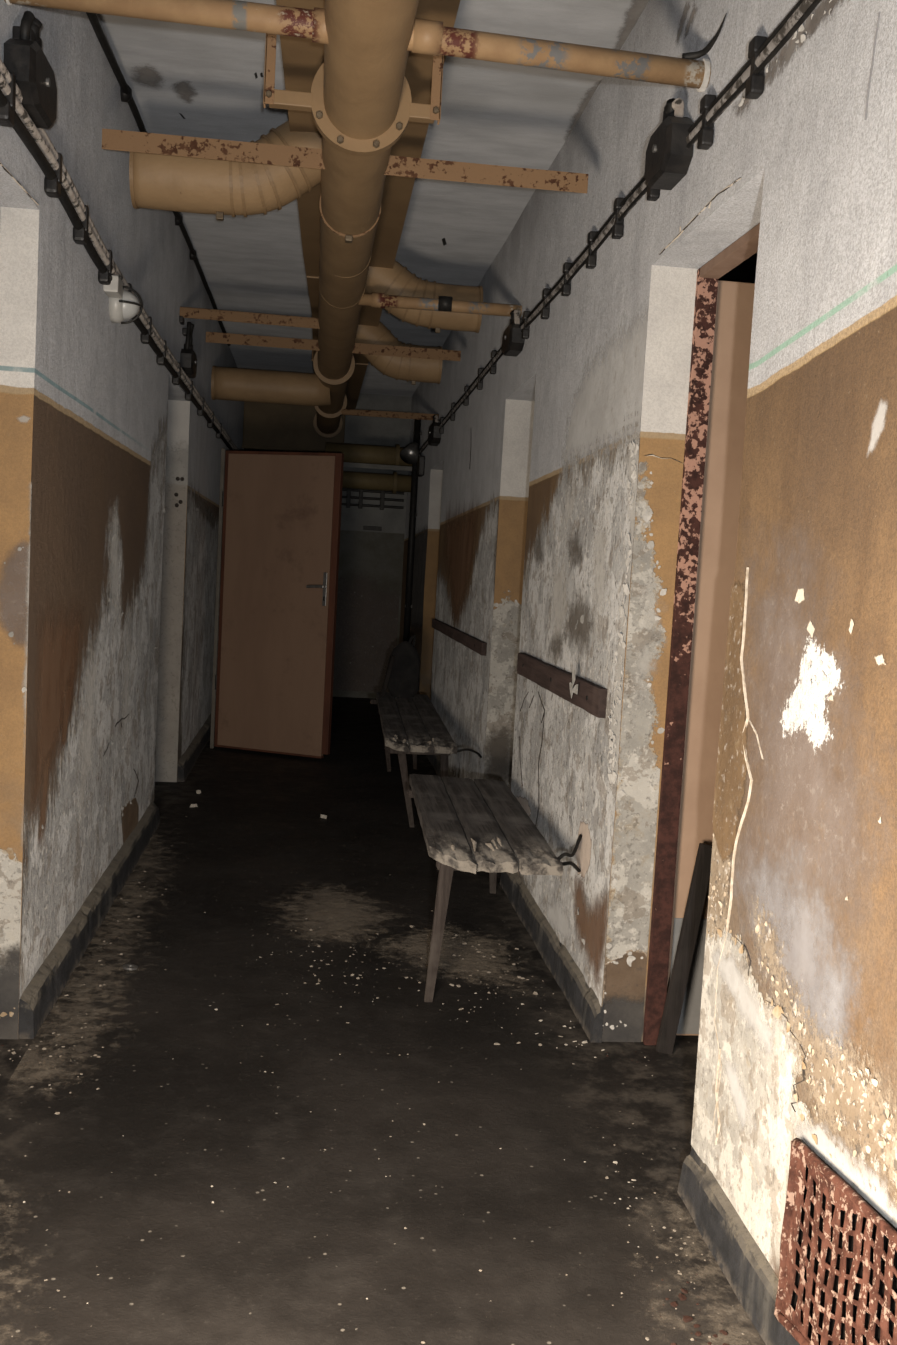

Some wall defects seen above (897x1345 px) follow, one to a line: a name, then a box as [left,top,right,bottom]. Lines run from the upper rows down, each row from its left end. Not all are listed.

peeling [0,413,221,1017]
peeling [431,420,667,1030]
crack [713,567,806,1185]
peeling [691,897,897,1274]
peeling [795,589,805,603]
peeling [780,621,842,754]